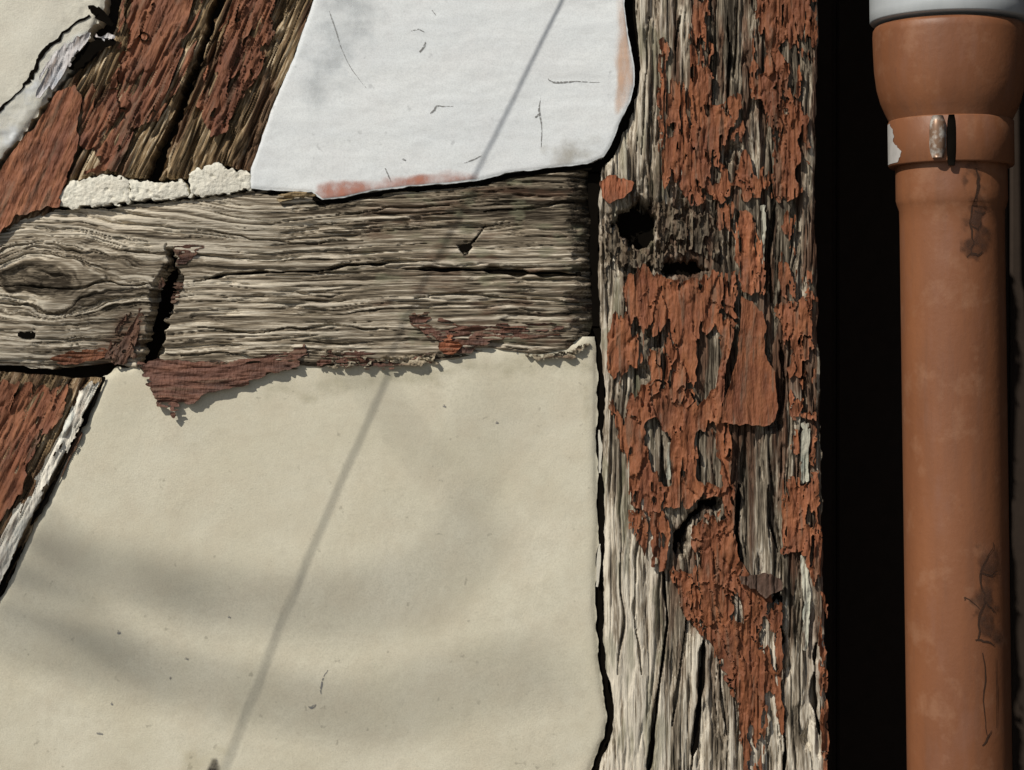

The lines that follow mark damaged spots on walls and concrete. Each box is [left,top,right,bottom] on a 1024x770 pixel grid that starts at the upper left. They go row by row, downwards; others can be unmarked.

peeling [0,0,203,233]
peeling [196,0,275,137]
peeling [600,175,634,204]
peeling [50,308,564,418]
crack [144,0,654,770]
peeling [607,0,829,770]
peeling [0,379,100,583]
crack [648,484,742,770]
crack [772,591,785,646]
crack [781,717,789,770]
crack [812,643,820,734]